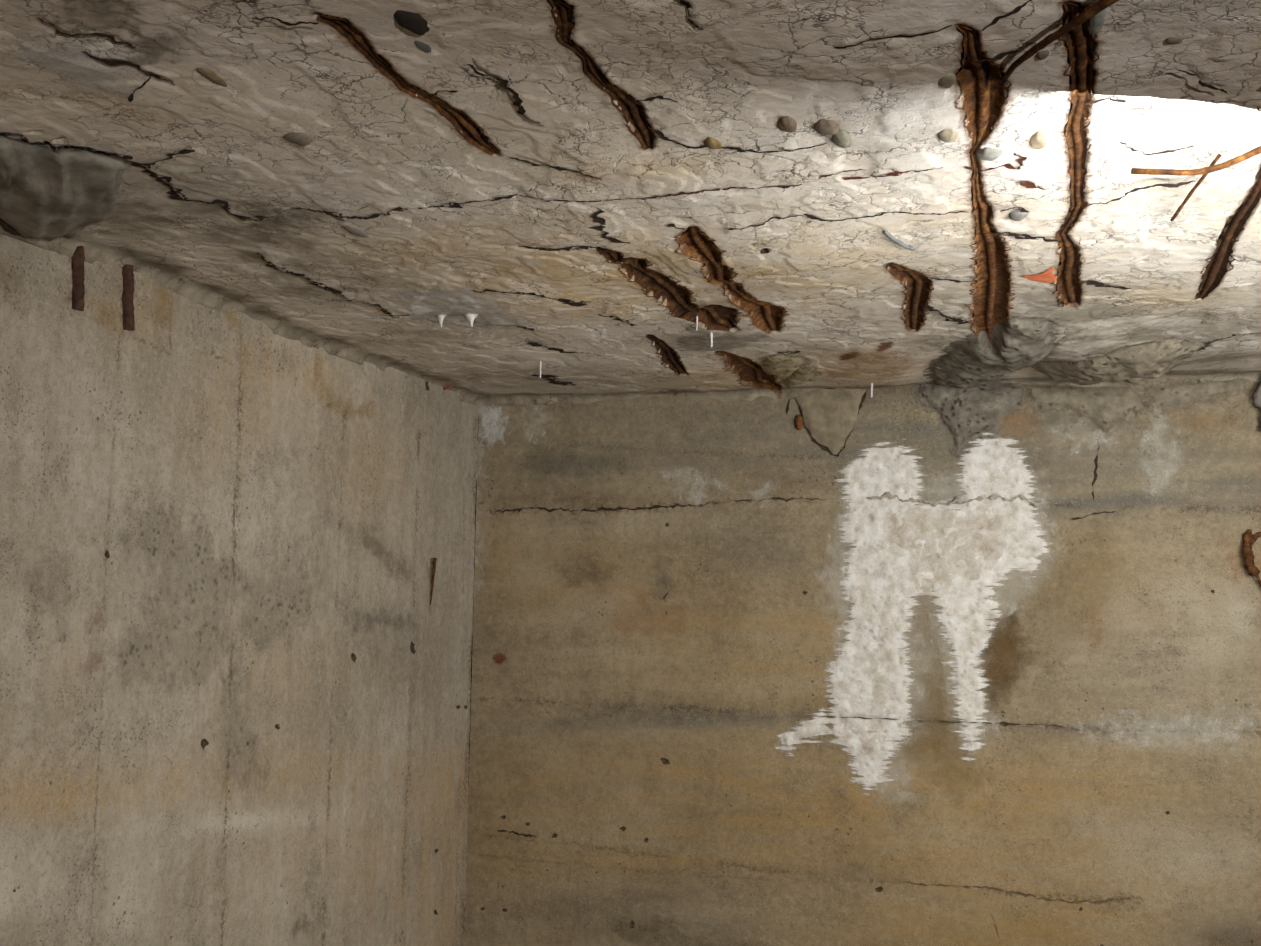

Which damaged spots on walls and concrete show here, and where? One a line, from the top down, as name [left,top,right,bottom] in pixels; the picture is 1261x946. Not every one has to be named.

crack [38,17,175,103]
spalling [252,13,498,155]
crack [467,64,543,126]
spalling [549,0,689,150]
crack [0,133,1049,222]
crack [472,289,635,326]
spalling [539,208,789,392]
spalling [886,0,1126,341]
crack [1086,281,1132,290]
crack [1085,142,1195,206]
spalling [1197,168,1261,300]
leakage [775,432,1057,795]